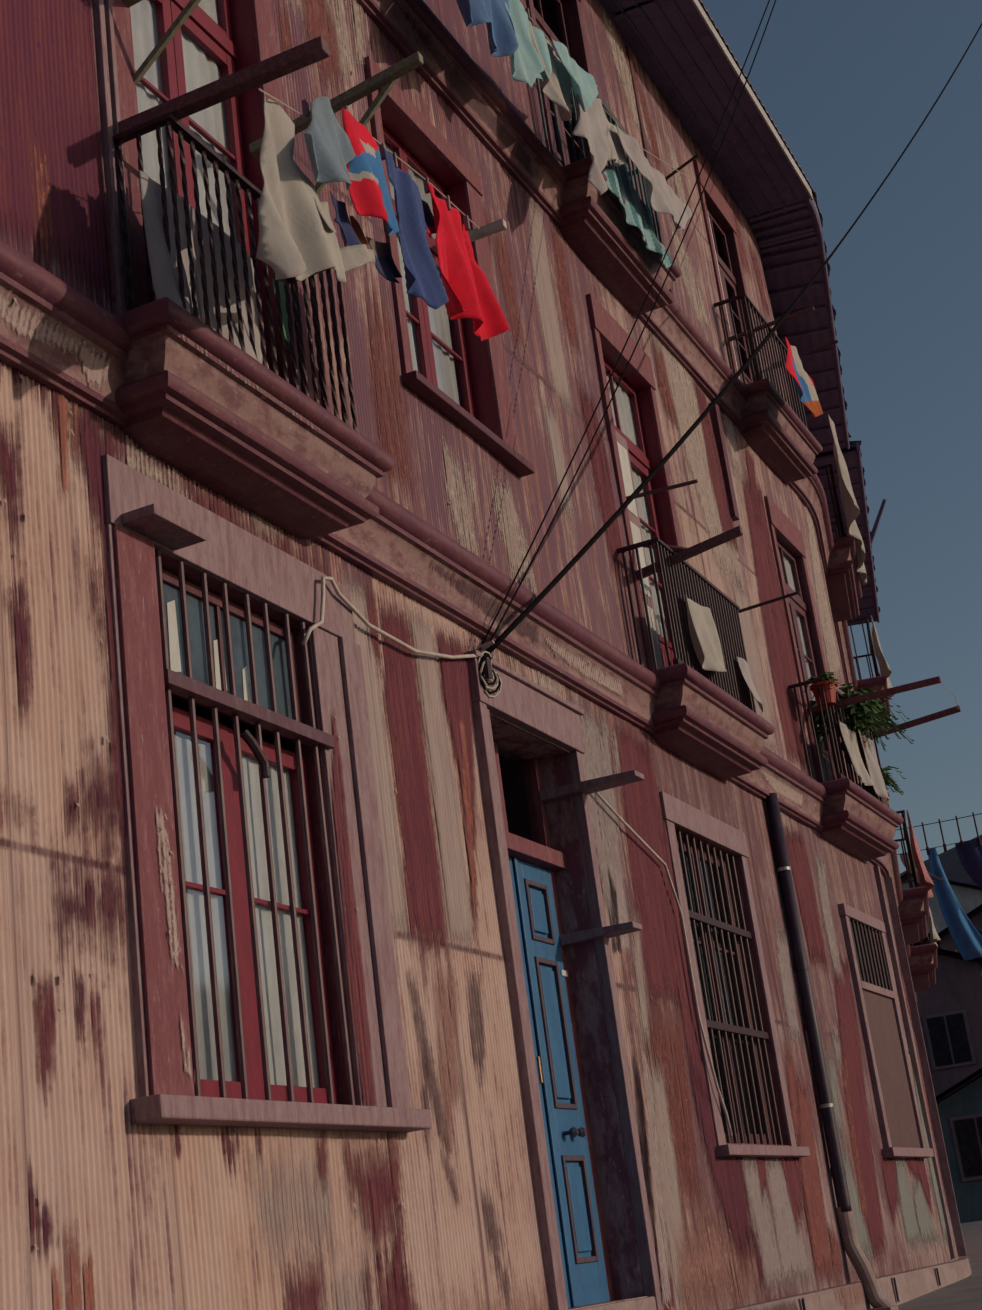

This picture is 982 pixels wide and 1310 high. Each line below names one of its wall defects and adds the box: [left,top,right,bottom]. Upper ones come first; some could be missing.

rust [362,585,459,1149]
rust [615,720,864,1310]
rust [784,826,949,1261]
rust [52,1221,95,1310]
rust [282,1254,328,1310]